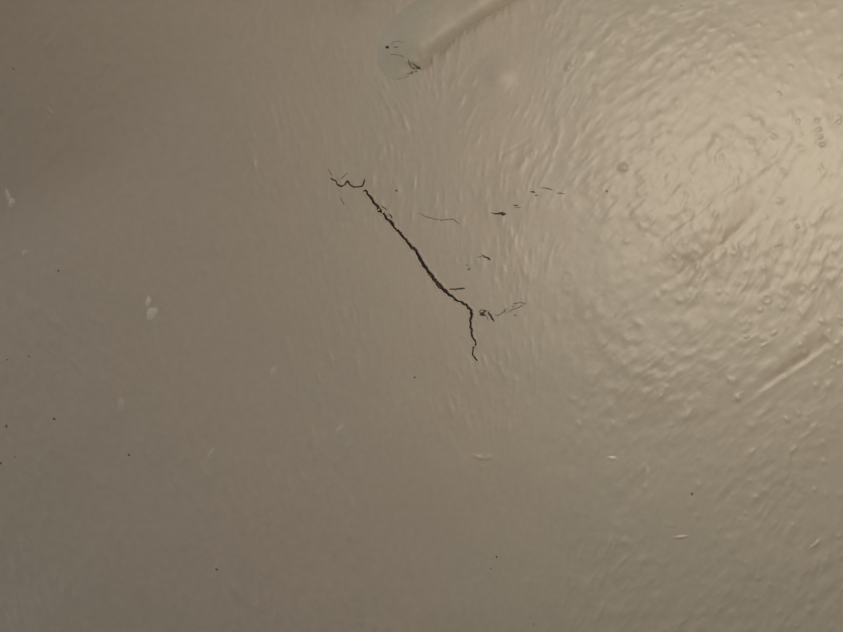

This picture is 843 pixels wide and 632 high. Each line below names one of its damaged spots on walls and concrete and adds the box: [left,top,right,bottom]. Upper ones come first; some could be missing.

crack [328,169,490,366]
crack [493,187,564,216]